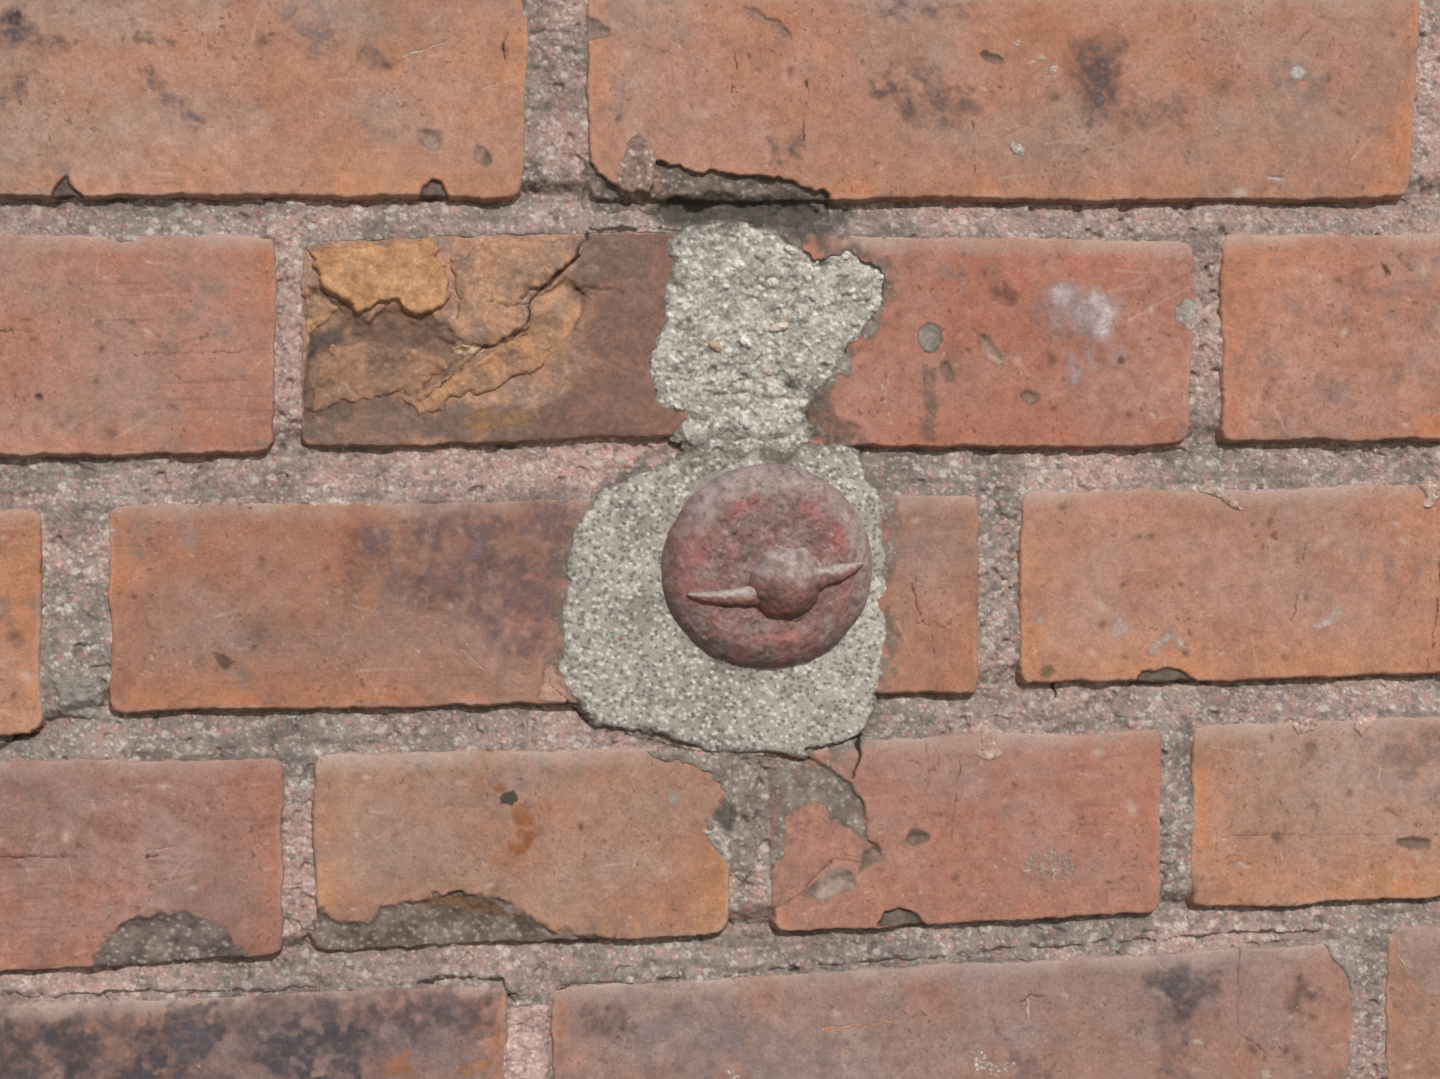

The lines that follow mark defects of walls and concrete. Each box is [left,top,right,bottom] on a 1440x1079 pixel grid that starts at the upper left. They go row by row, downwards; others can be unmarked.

peeling [419,180,449,201]
spalling [475,146,491,167]
spalling [579,132,829,222]
spalling [301,232,687,447]
crack [425,224,680,398]
peeling [702,826,734,862]
spalling [769,751,884,907]
spalling [93,911,248,967]
spalling [314,891,604,951]